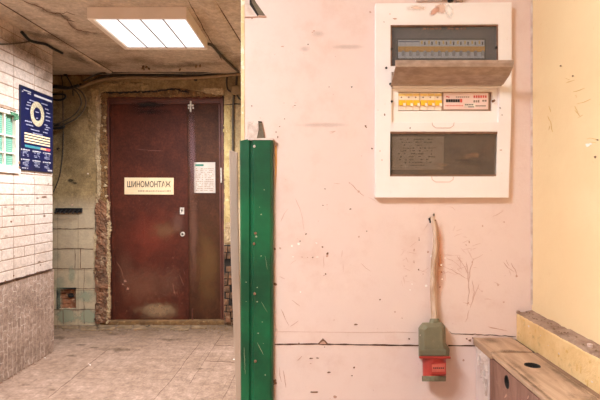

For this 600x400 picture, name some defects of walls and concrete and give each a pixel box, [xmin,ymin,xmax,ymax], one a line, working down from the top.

crack [22,0,91,33]
flaking render [57,88,222,331]
peeling [223,105,233,325]